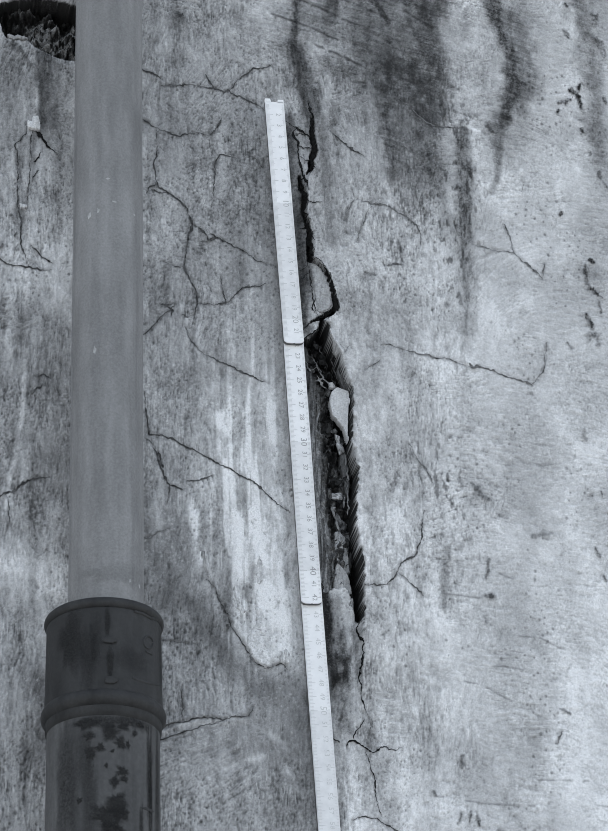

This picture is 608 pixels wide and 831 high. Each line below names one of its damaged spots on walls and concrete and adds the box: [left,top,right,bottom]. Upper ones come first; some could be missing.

crack [0,126,55,270]
crack [142,117,267,382]
damp [286,116,297,154]
damp [289,168,312,333]
damp [281,0,323,119]
crack [286,100,339,339]
damp [457,126,476,248]
damp [485,0,530,133]
crack [367,342,547,385]
crack [143,391,290,513]
spalling [304,265,358,623]
crack [333,622,402,831]